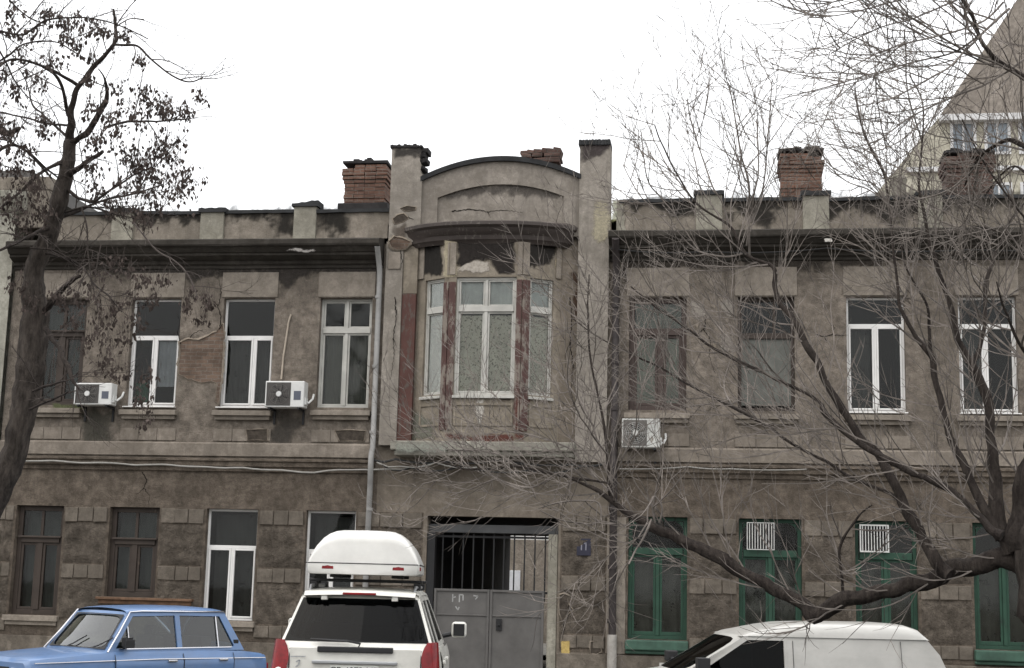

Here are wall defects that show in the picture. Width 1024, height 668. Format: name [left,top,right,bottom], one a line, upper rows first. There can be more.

spalling [388,205,417,271]
peeling [443,240,489,277]